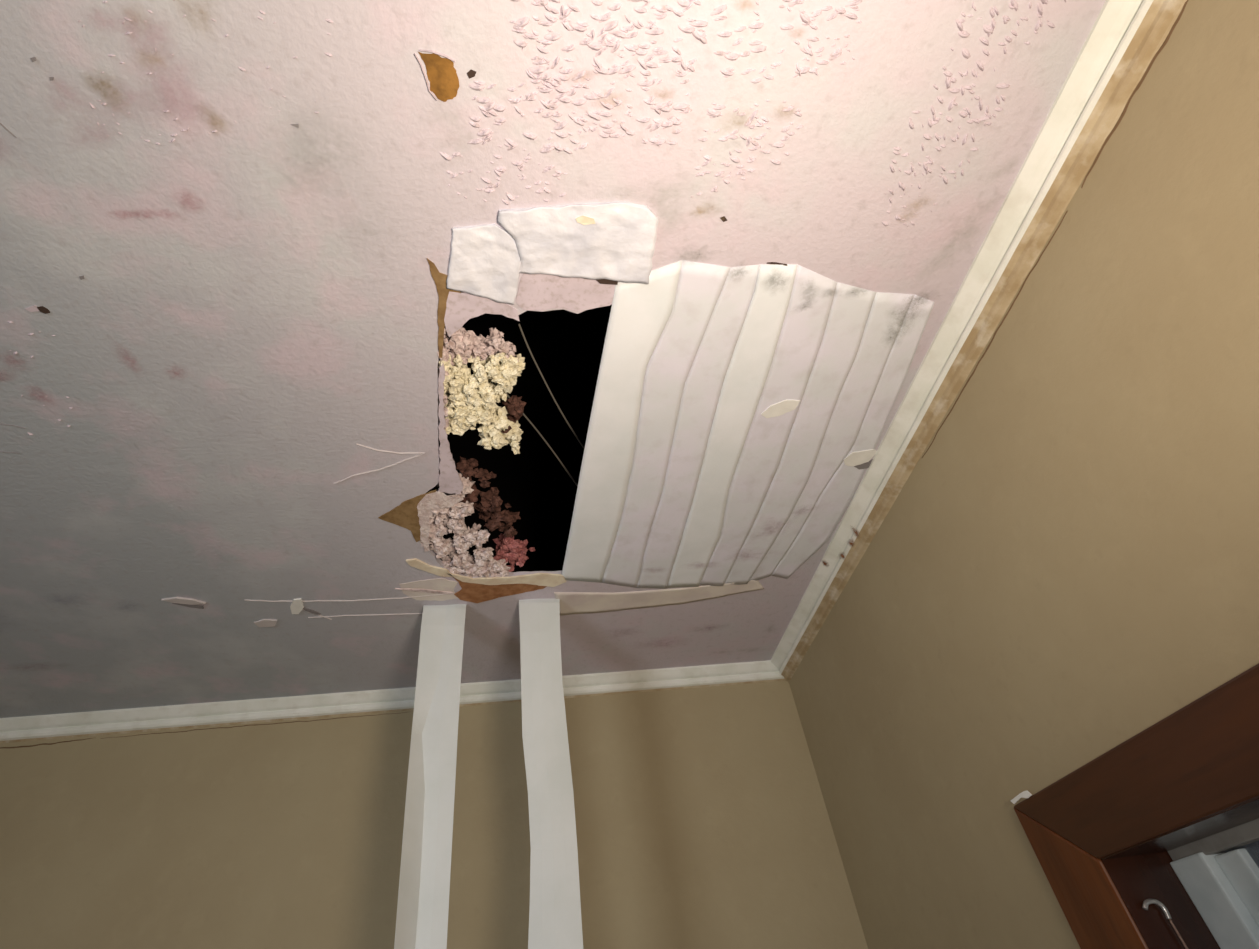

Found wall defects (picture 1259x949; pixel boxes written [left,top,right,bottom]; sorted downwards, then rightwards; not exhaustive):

spalling [414,49,476,102]
spalling [378,258,618,603]